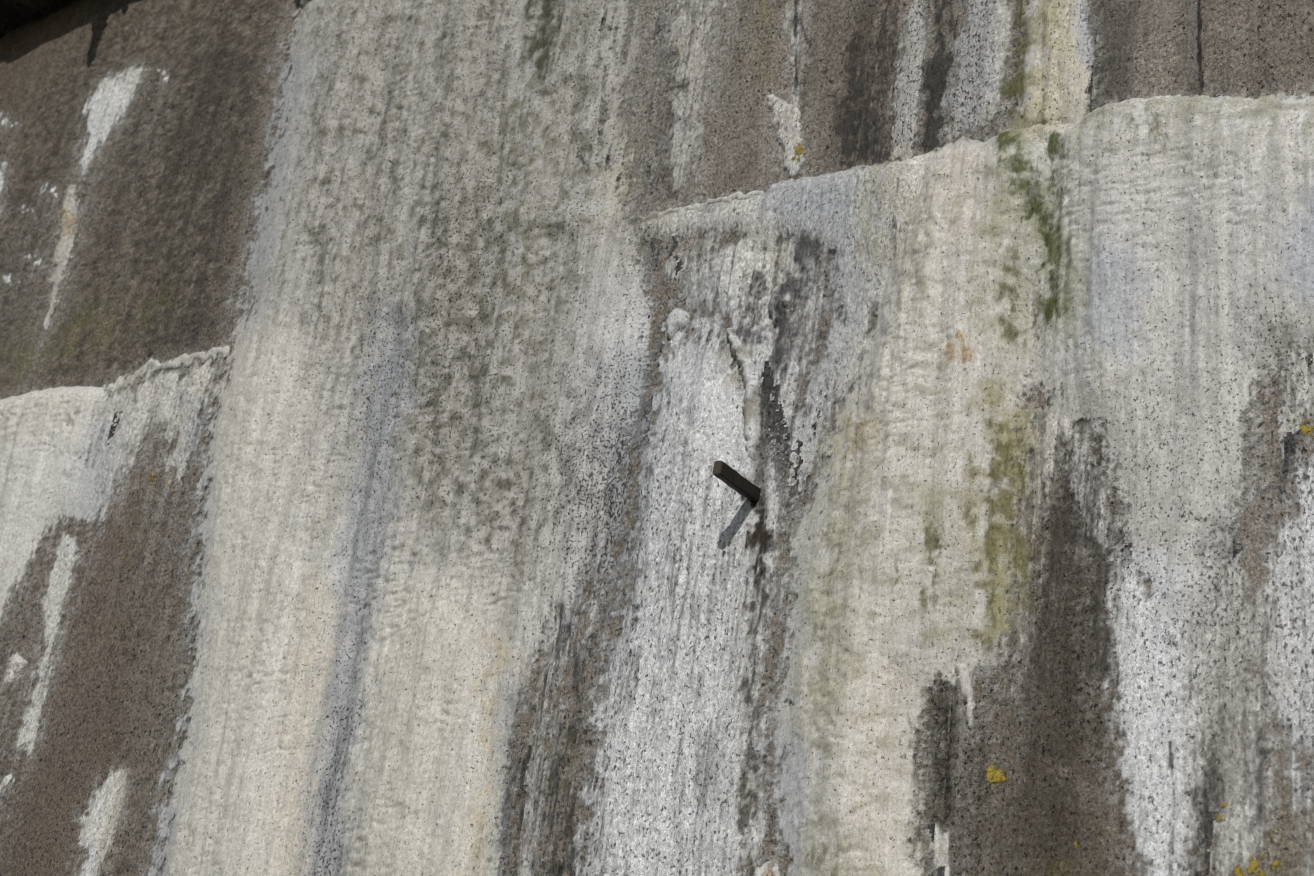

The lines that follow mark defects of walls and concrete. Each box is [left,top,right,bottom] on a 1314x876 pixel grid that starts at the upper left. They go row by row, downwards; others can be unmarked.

damp [43,66,147,331]
damp [726,236,819,461]
damp [999,253,1018,339]
damp [1028,200,1057,318]
damp [15,533,82,756]
damp [78,768,128,876]
damp [738,755,757,846]
damp [741,509,768,738]
damp [921,824,950,876]
damp [954,663,976,727]
damp [1015,445,1114,682]
damp [1189,656,1314,876]